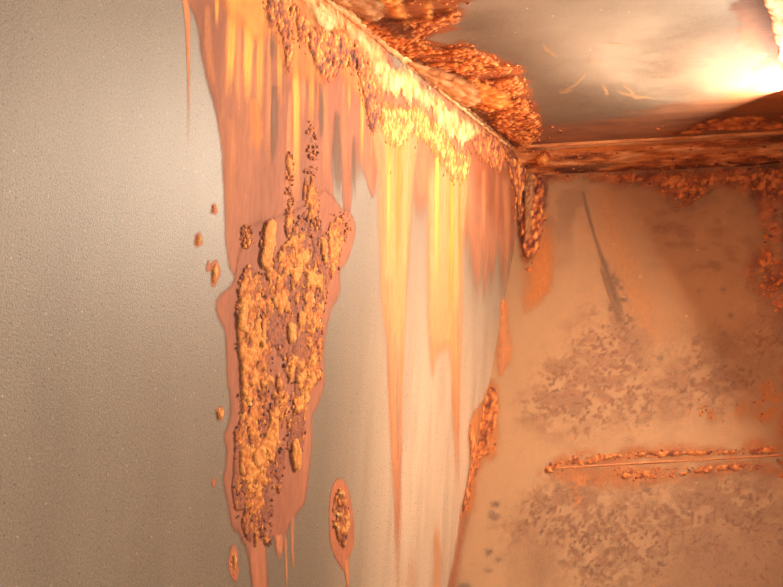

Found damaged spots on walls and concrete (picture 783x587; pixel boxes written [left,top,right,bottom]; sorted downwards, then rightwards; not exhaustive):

rust [182,0,783,587]